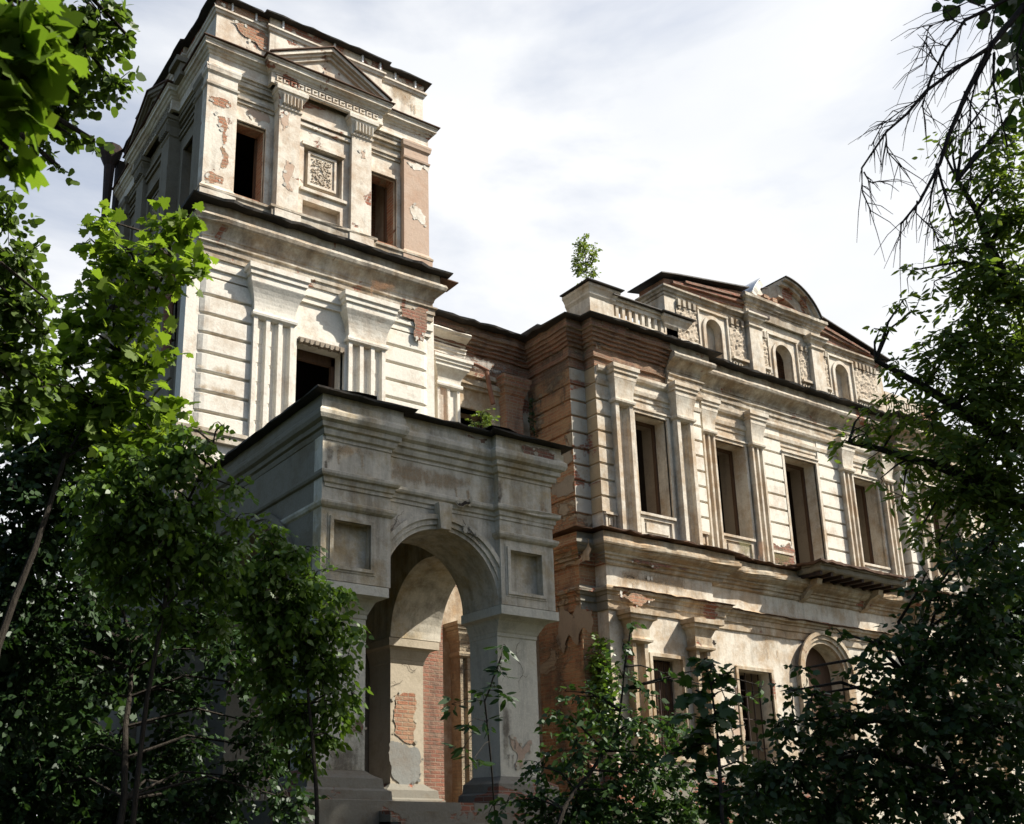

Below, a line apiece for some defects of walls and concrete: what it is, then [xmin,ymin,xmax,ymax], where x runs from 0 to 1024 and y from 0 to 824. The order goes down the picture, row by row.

flaking render [214,2,269,51]
flaking render [204,96,232,185]
peeling [282,160,295,192]
flaking render [400,306,429,342]
flaking render [618,590,655,607]
flaking render [392,691,418,745]